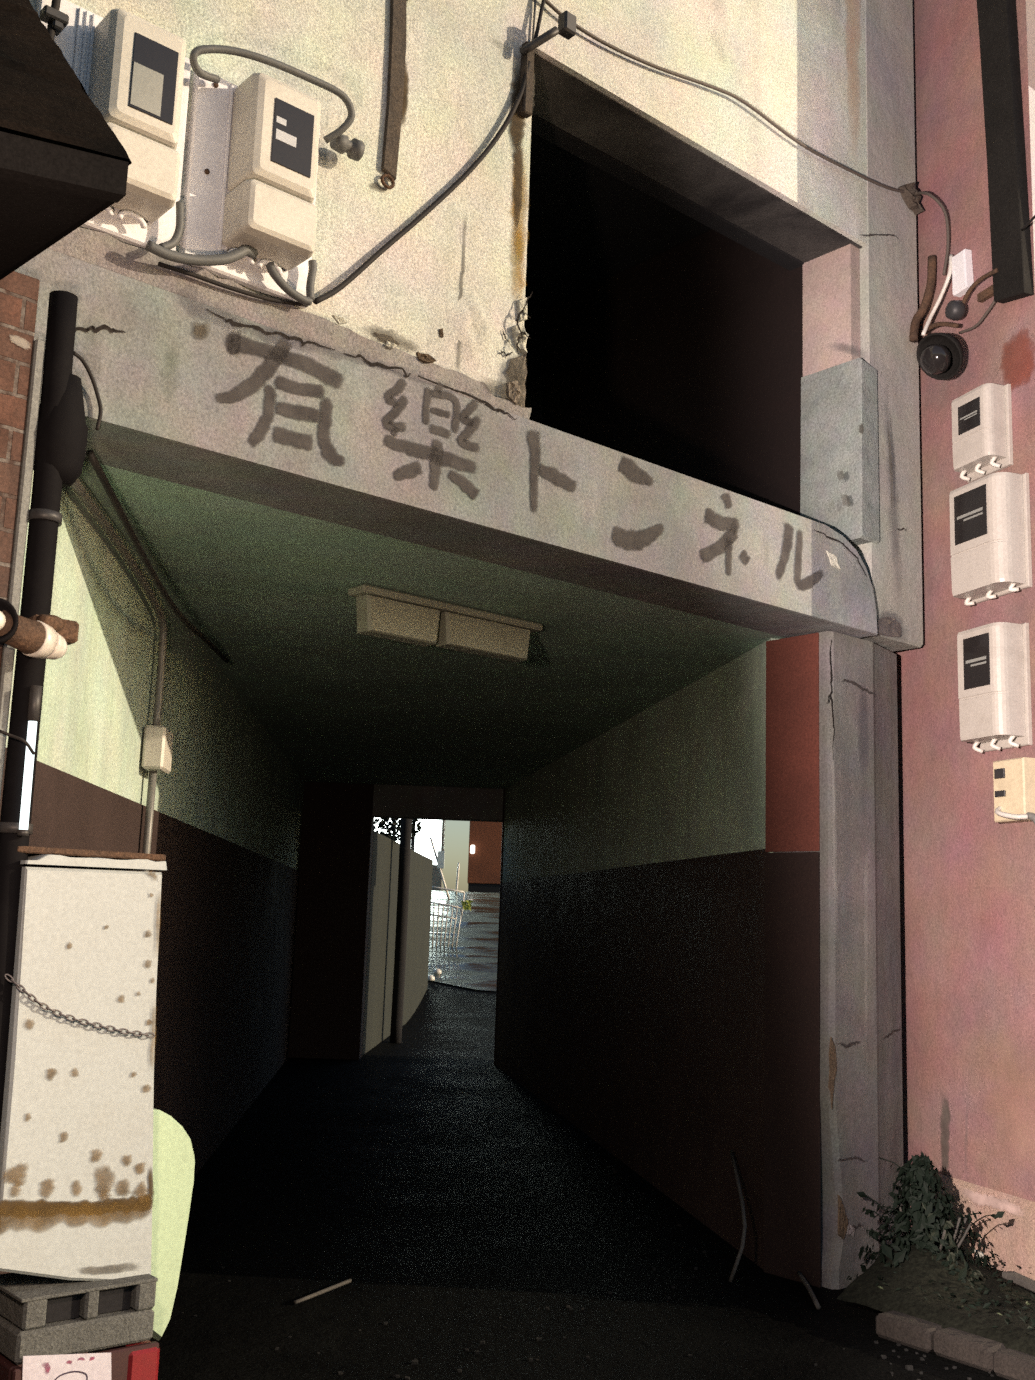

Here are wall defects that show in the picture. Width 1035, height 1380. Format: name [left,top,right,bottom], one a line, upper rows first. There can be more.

rust [510,70,534,284]
peeling [374,327,436,364]
spalling [489,297,529,408]